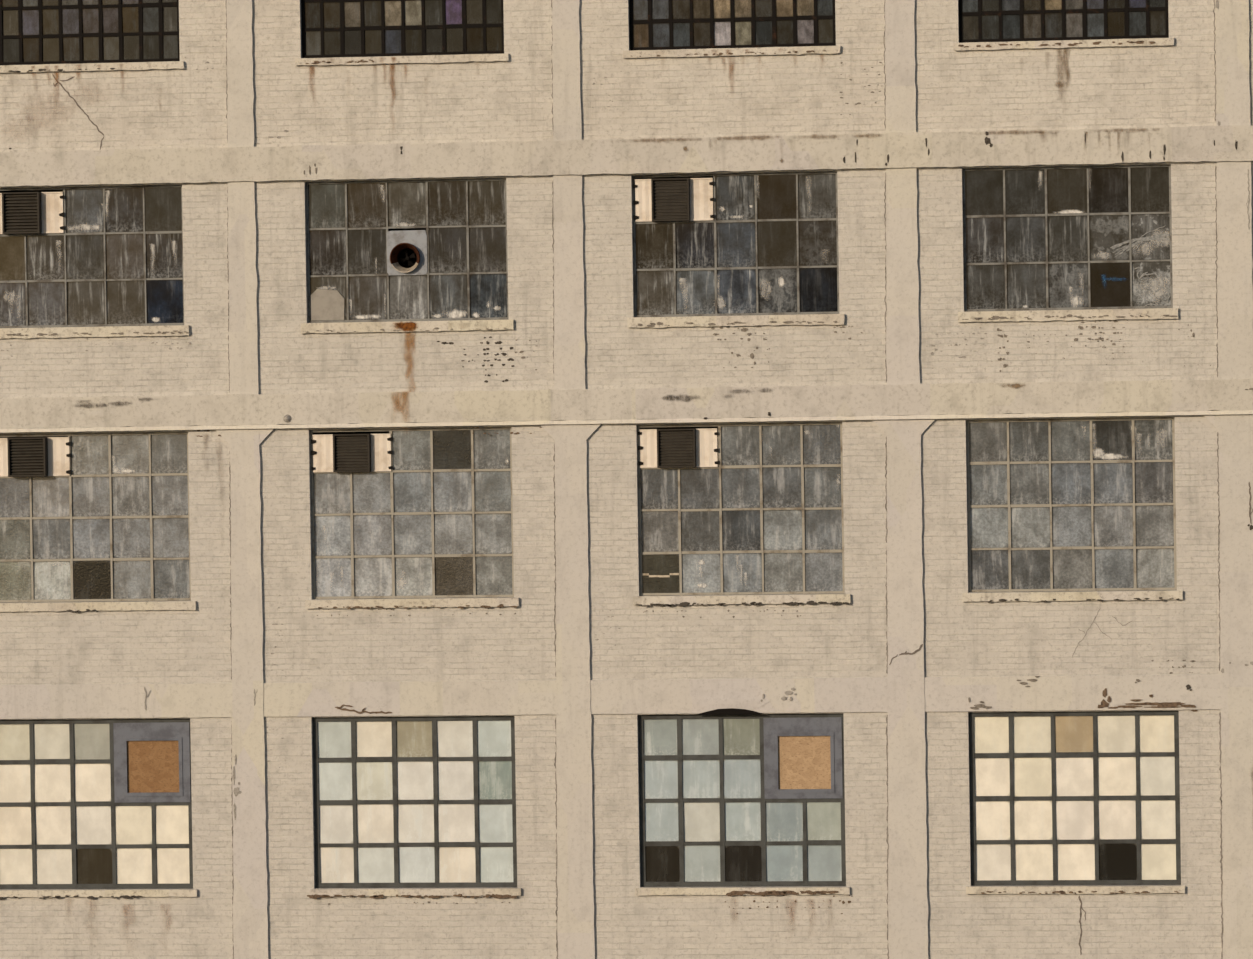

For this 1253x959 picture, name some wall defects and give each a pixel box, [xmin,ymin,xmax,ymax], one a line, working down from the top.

crack [881,3,889,128]
crack [52,74,104,150]
crack [881,172,889,382]
rust [397,322,416,373]
peeling [425,327,537,383]
crack [885,437,923,673]
crack [1072,608,1133,658]
spalling [1098,660,1198,712]
crack [883,715,891,959]
crack [1078,896,1086,954]